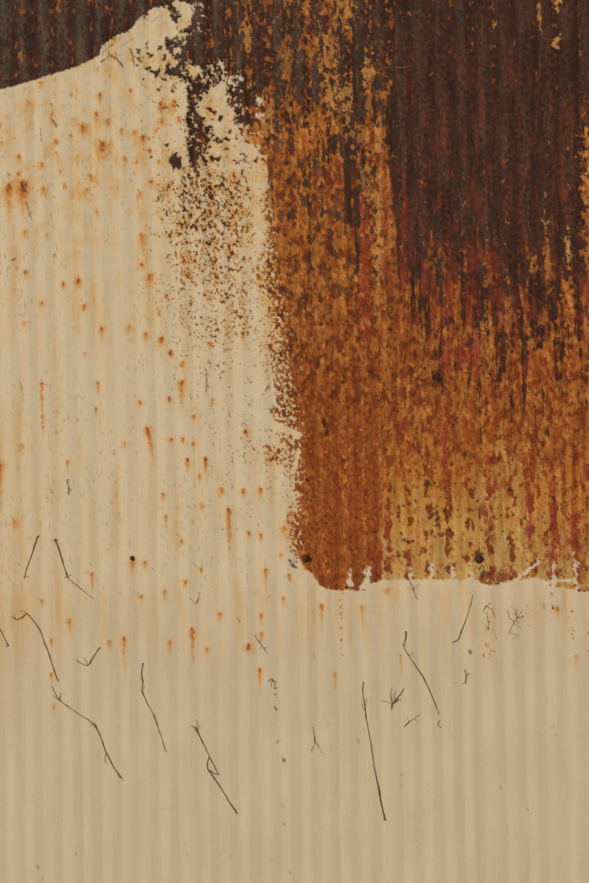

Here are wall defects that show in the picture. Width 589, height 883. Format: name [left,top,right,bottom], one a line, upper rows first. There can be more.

peeling [113,2,308,575]
rust [0,0,589,642]
peeling [381,454,589,594]
rust [106,634,131,678]
rust [164,624,213,676]
rust [241,609,268,701]